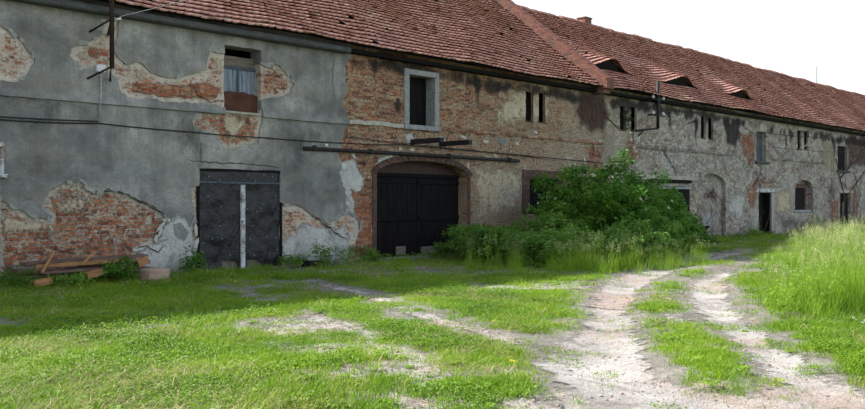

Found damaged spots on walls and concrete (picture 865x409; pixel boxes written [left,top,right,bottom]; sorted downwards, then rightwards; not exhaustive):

spalling [0,27,35,82]
spalling [70,18,294,149]
peeling [497,81,553,134]
peeling [467,154,528,224]
spalling [0,179,199,281]